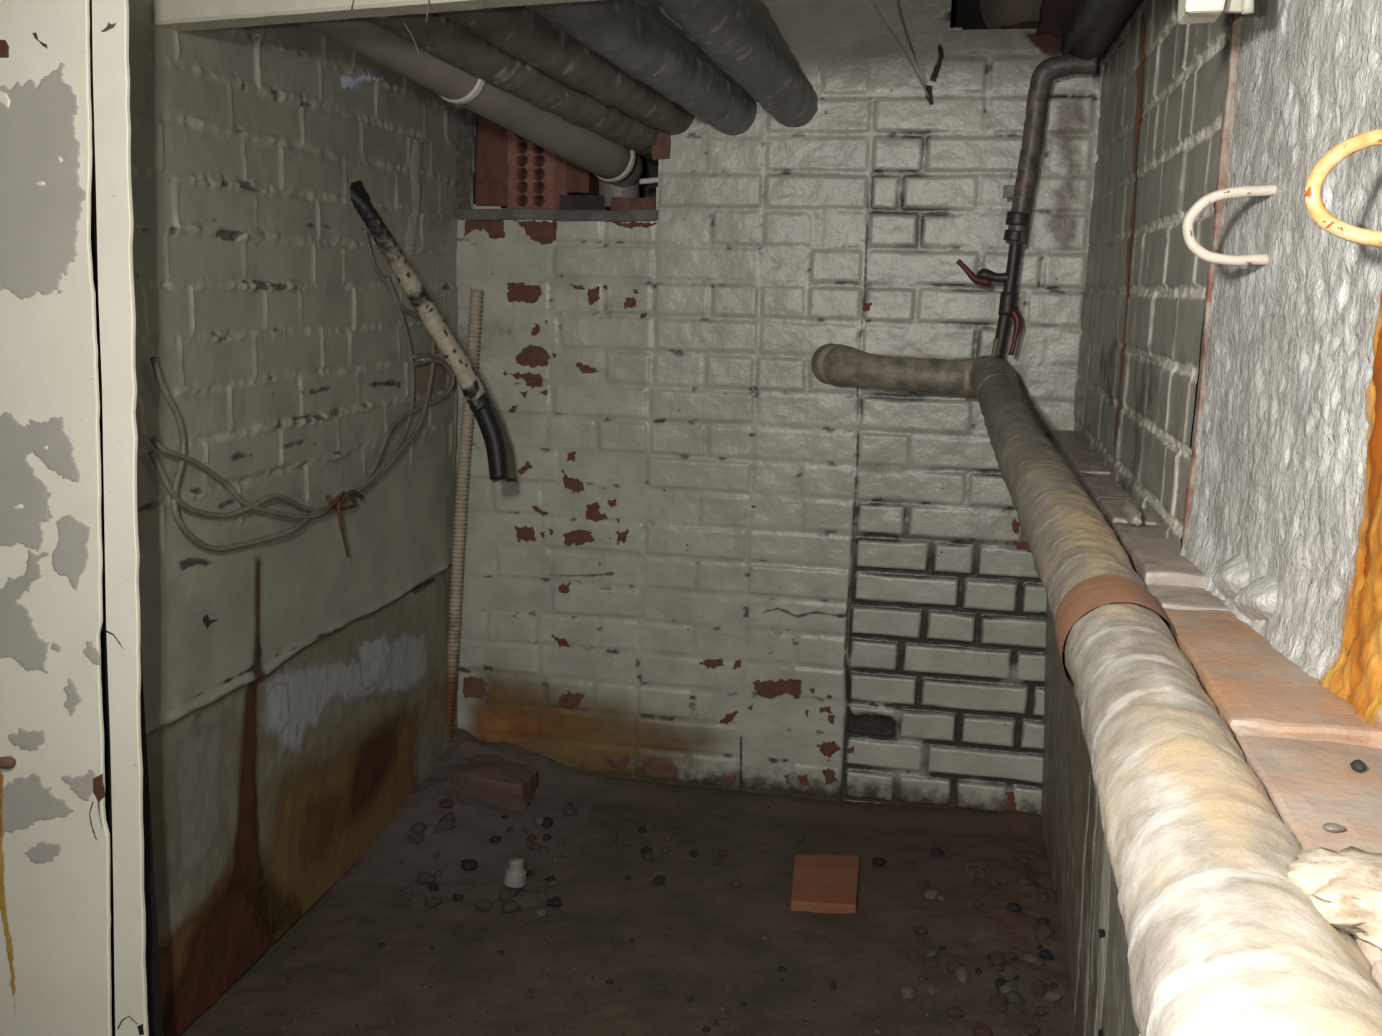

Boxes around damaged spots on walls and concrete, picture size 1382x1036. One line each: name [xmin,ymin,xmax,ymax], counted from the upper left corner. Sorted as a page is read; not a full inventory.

peeling [0,62,86,300]
peeling [464,220,557,245]
peeling [507,282,542,303]
peeling [570,284,608,305]
peeling [503,320,557,413]
peeling [0,412,90,674]
peeling [515,451,629,547]
corrosion [1320,289,1382,731]
efflorescence [264,632,427,752]
peeling [1,770,96,833]
corrosion [159,562,417,1036]
corrosion [0,772,15,995]